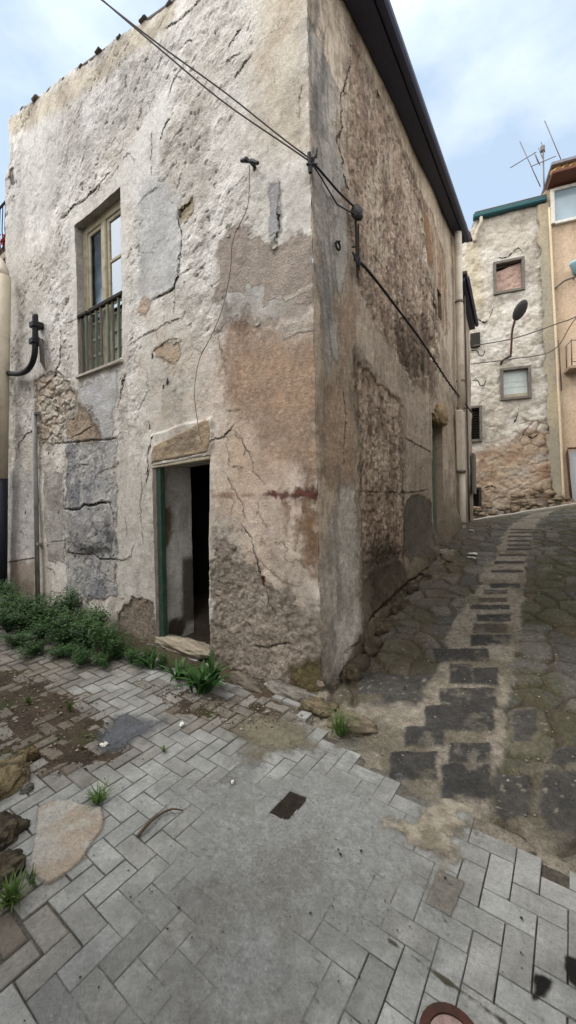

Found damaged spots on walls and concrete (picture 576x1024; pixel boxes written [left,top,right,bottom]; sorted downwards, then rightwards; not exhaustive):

crack [65,119,170,216]
crack [336,33,351,196]
crack [133,203,190,362]
peeling [214,224,314,308]
peeling [29,370,119,602]
crack [209,410,309,612]
rust [266,486,317,509]